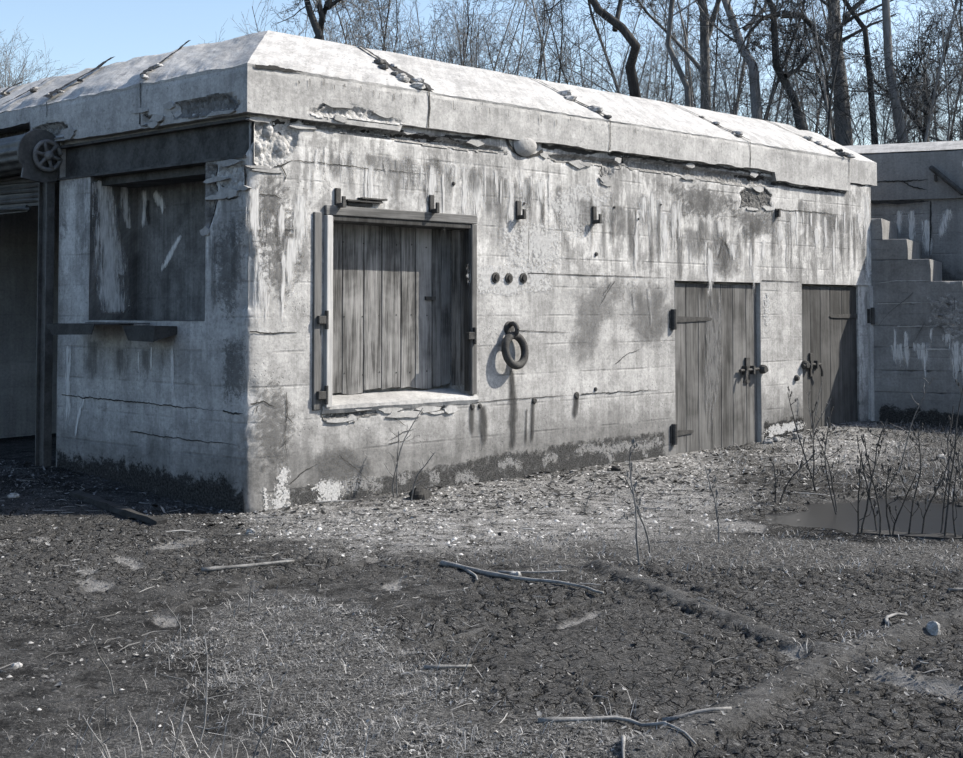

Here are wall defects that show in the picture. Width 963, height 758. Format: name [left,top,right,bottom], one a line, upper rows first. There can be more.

spalling [130,93,237,128]
crack [255,64,302,83]
crack [348,44,509,143]
efflorescence [250,189,308,317]
crack [221,119,433,214]
spalling [200,99,508,322]
damp [339,152,610,269]
spalling [540,152,778,239]
efflorescence [896,209,952,251]
damp [891,328,963,378]
efflorescence [262,467,291,510]
damp [574,437,664,464]